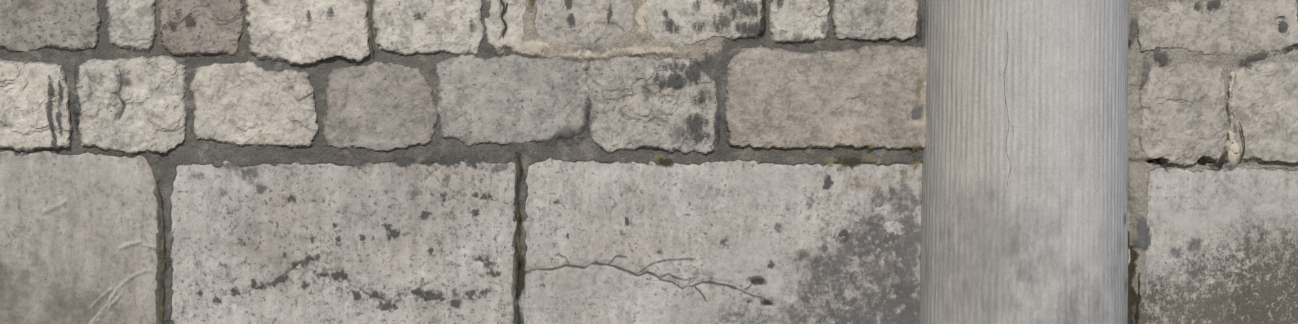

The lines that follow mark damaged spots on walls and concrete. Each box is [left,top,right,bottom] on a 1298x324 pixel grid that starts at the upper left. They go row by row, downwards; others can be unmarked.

crack [198,252,768,311]